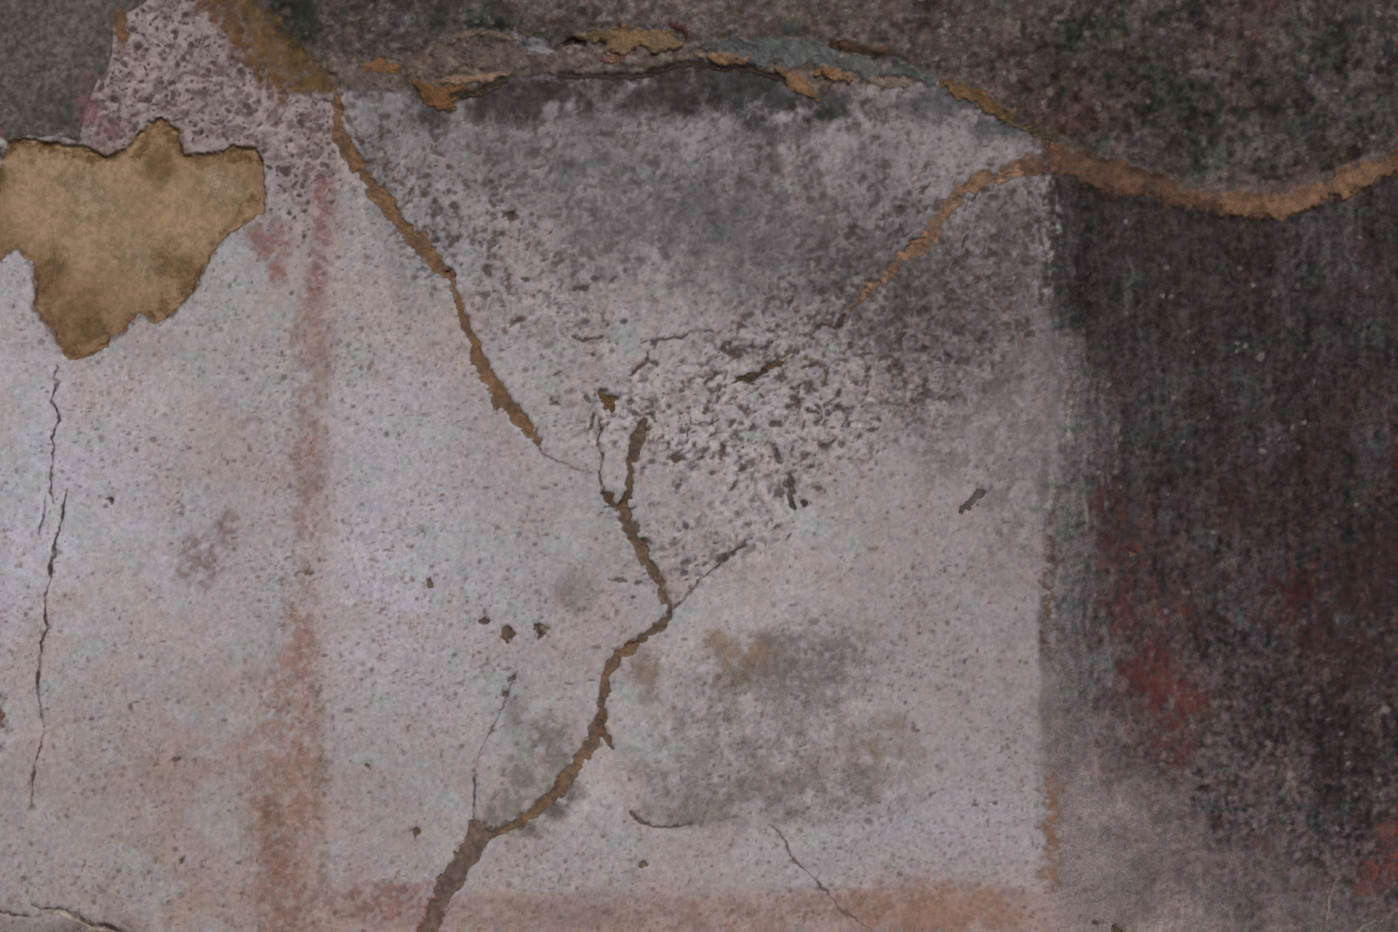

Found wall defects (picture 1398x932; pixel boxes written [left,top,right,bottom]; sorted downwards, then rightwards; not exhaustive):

crack [328,74,564,463]
spalling [0,0,910,359]
damp [413,63,868,139]
damp [896,87,977,120]
spalling [934,187,1028,320]
spalling [941,77,1060,140]
crack [804,141,1398,335]
crack [727,359,783,385]
spalling [553,226,1033,510]
crack [31,365,68,803]
crack [417,417,753,932]
spalling [609,524,735,599]